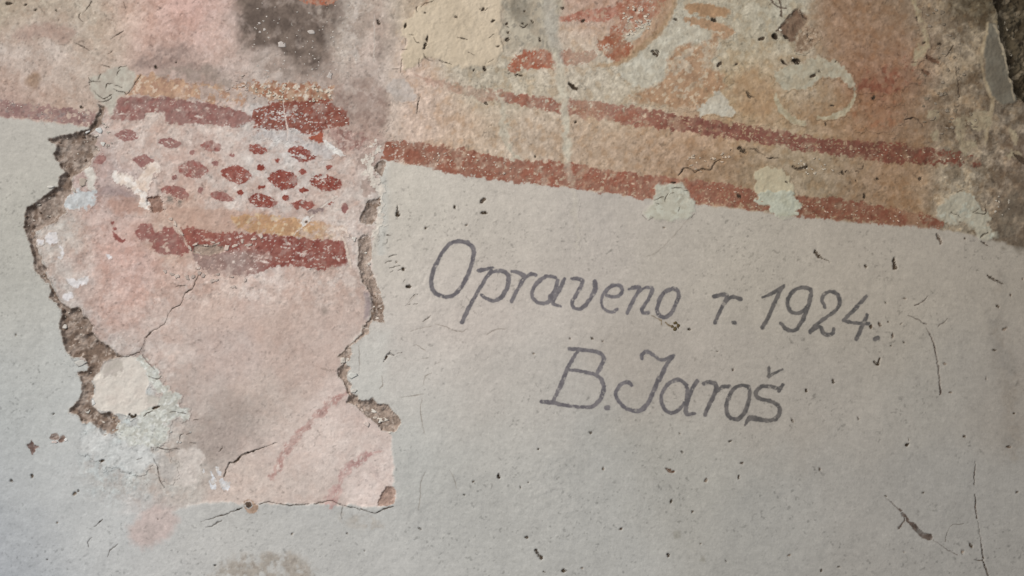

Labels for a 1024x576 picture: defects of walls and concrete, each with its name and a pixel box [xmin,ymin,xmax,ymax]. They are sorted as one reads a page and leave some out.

spalling [992,0,1024,103]
peeling [226,74,348,129]
spalling [23,103,181,450]
spalling [147,194,263,288]
crack [116,275,199,380]
spalling [26,432,67,456]
crack [128,410,278,488]
crack [87,518,119,558]
hole [243,498,259,515]
spalling [377,486,397,507]